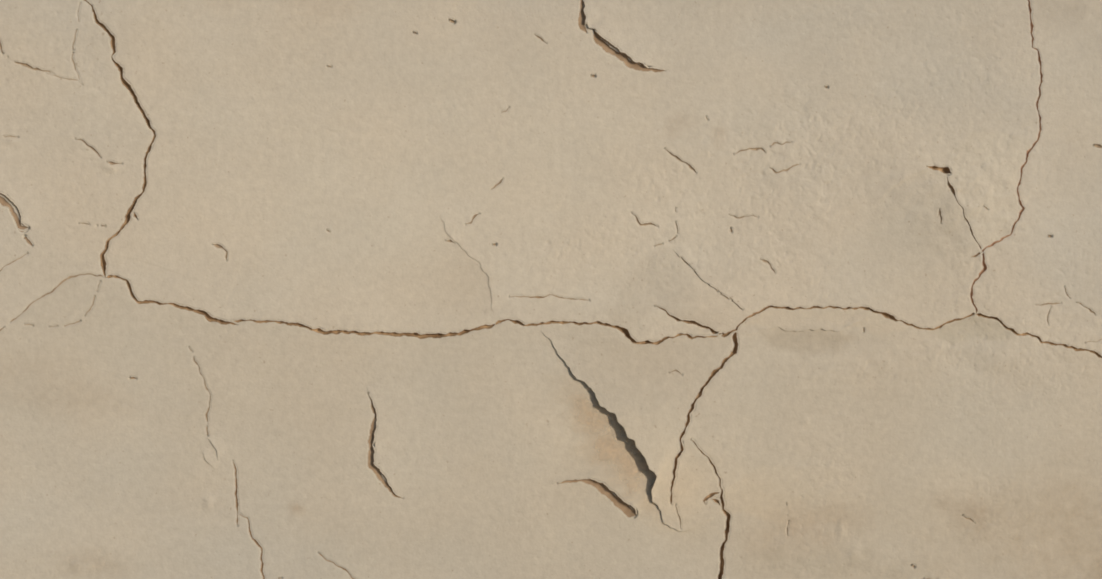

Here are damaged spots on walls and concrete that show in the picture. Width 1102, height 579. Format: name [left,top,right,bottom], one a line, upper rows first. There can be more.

crack [15,30,82,84]
flaking render [578,0,702,72]
crack [84,0,717,345]
crack [11,273,102,322]
crack [655,0,1102,504]
crack [189,348,211,435]
flaking render [367,374,426,498]
flaking render [539,325,773,532]
crack [233,462,265,579]
crack [692,440,731,579]